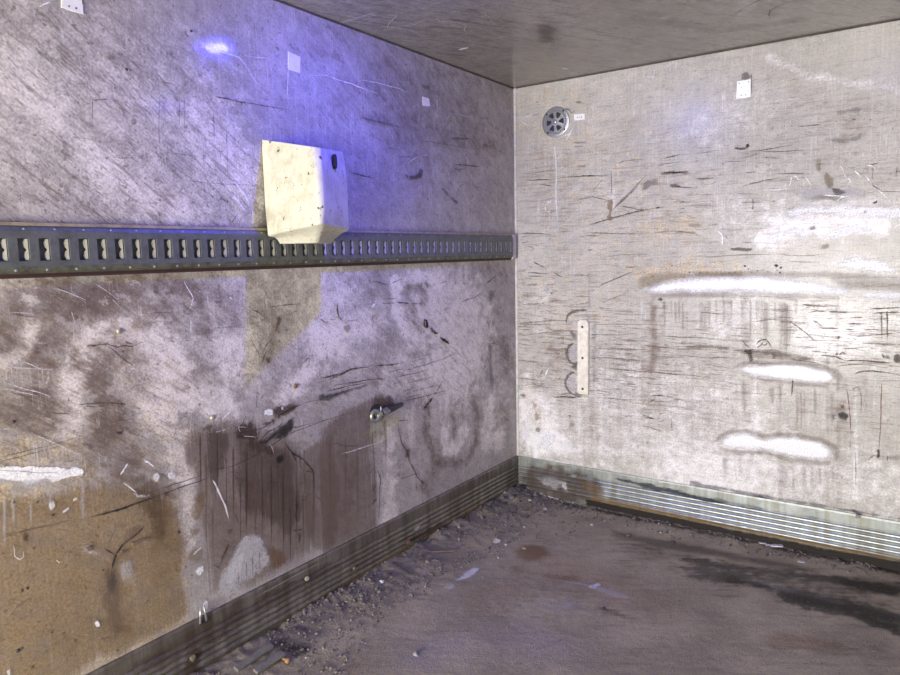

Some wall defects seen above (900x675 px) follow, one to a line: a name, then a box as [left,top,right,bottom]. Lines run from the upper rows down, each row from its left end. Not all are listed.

leakage [218,456,284,597]